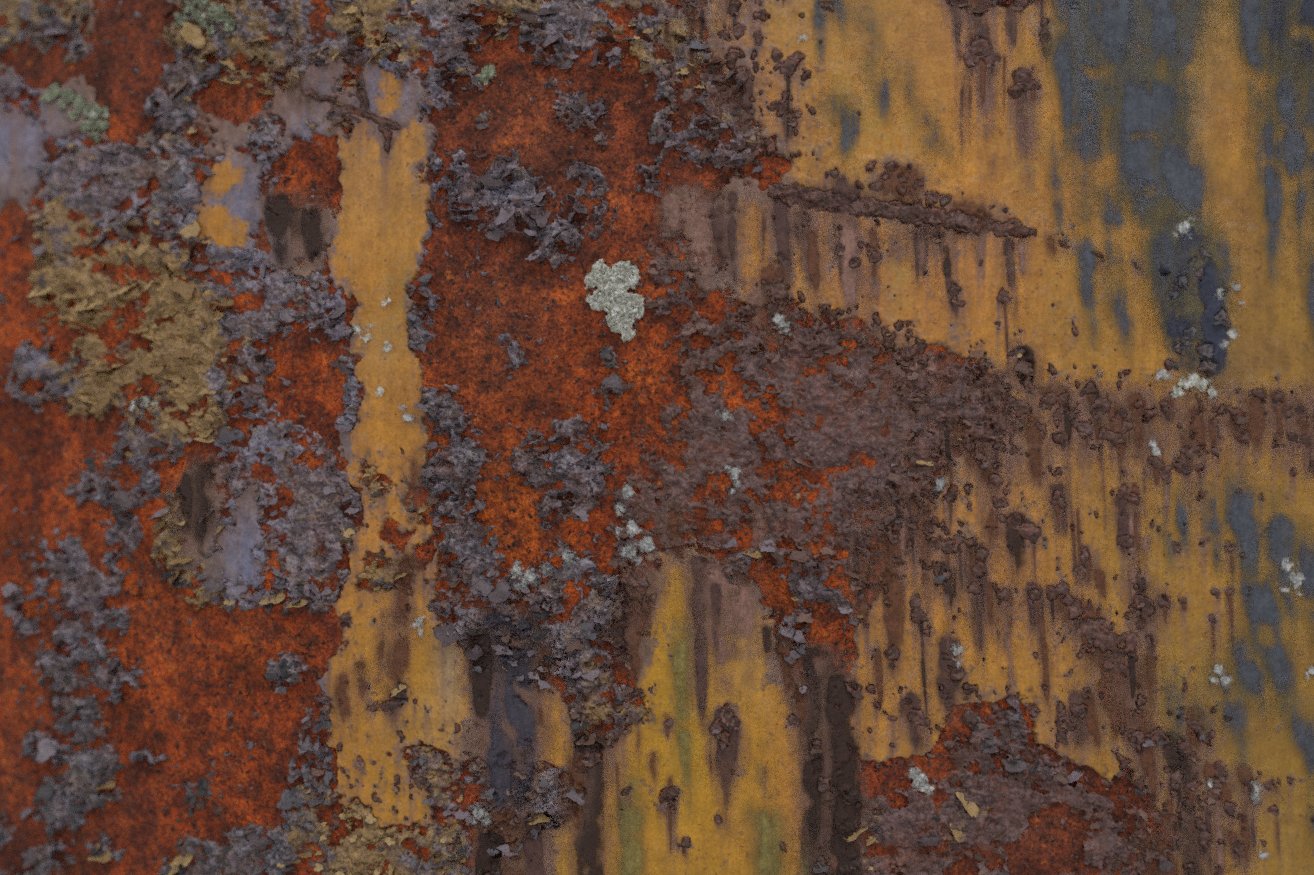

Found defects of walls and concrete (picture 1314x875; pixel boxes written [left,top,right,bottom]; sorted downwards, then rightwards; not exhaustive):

rust [664,0,818,172]
rust [946,0,1054,154]
rust [264,192,324,267]
rust [662,173,984,337]
rust [175,456,215,550]
peeling [0,0,1043,875]
damp [1165,499,1187,556]
rust [334,544,430,722]
damp [467,611,546,819]
damp [673,639,690,783]
peeling [833,665,1192,875]
damp [1205,481,1314,774]